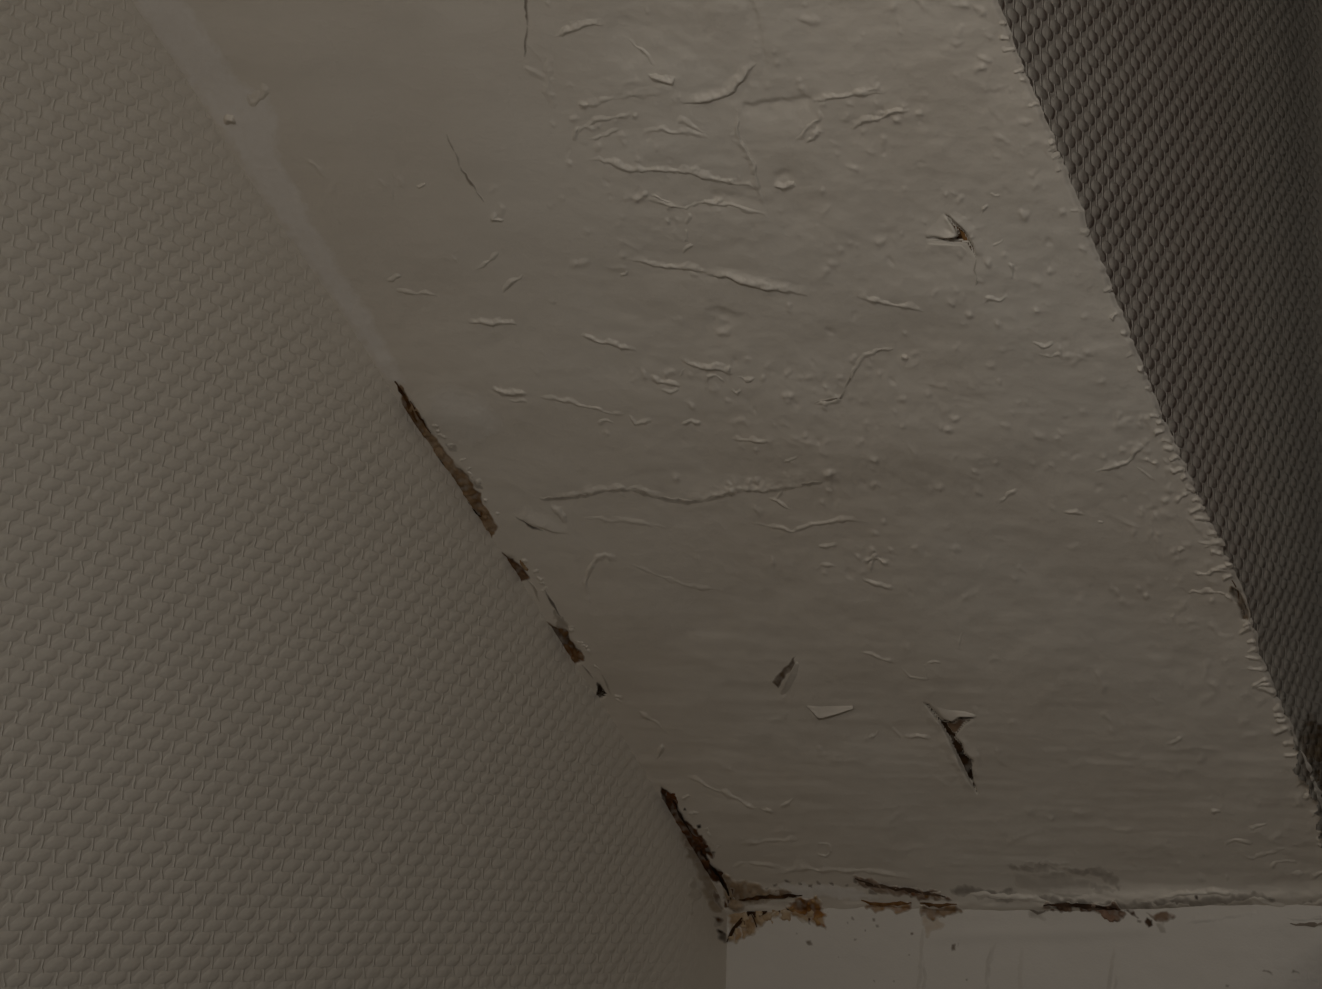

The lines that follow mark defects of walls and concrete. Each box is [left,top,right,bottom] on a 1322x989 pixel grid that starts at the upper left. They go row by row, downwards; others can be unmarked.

flaking render [772,656,796,688]
spalling [721,860,964,945]
spalling [1028,901,1176,933]